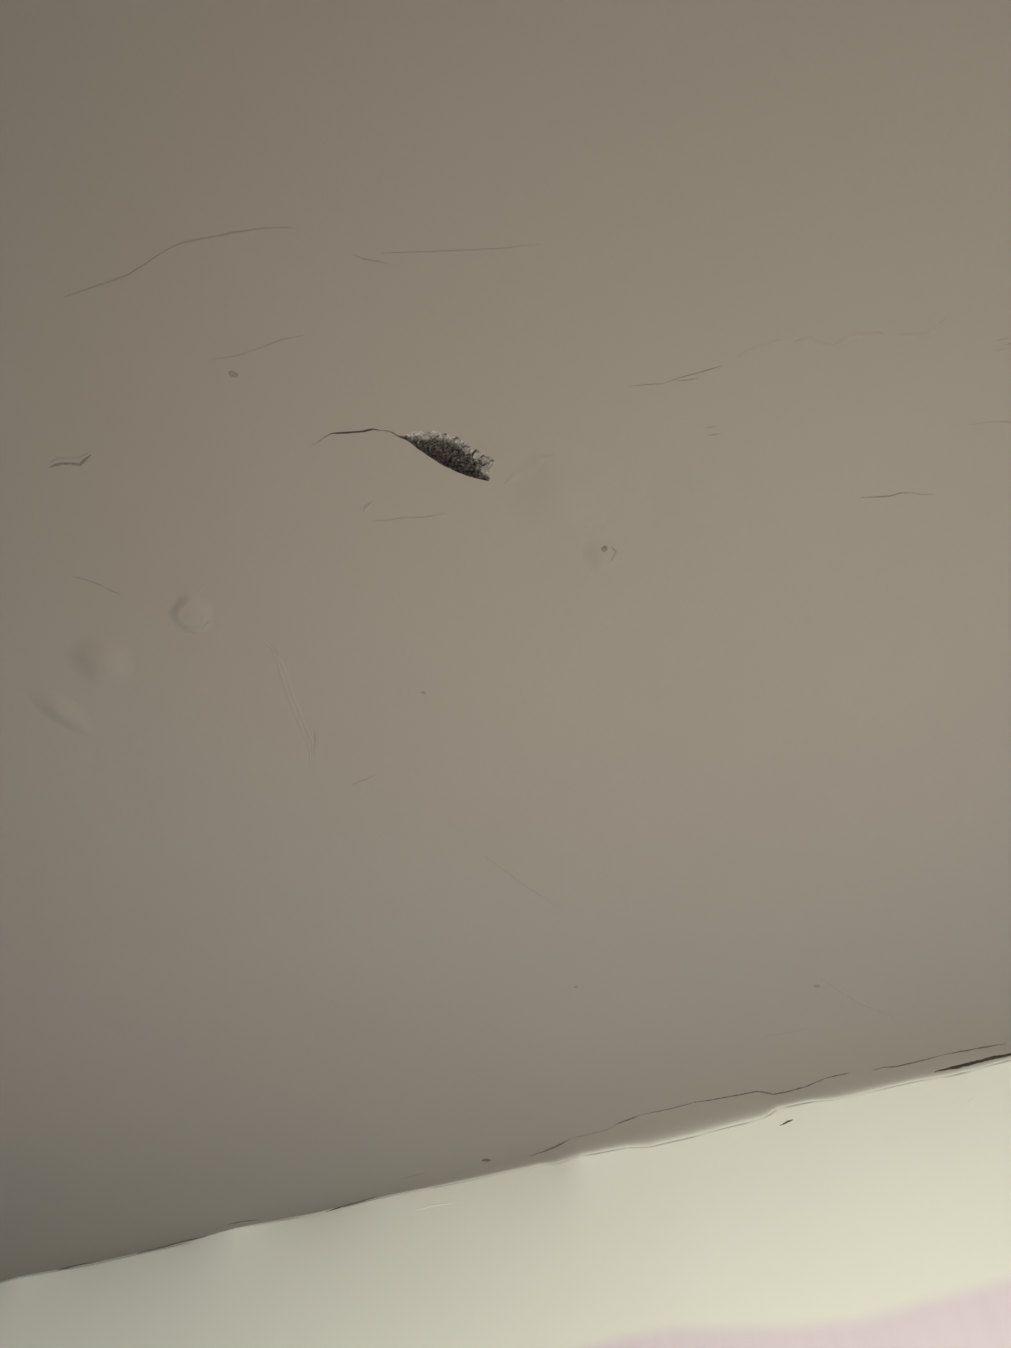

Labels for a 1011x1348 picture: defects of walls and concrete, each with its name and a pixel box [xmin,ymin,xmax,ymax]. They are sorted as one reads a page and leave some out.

spalling [400,430,495,481]
crack [531,1044,1011,1156]
crack [326,1172,426,1212]
crack [137,1220,254,1254]